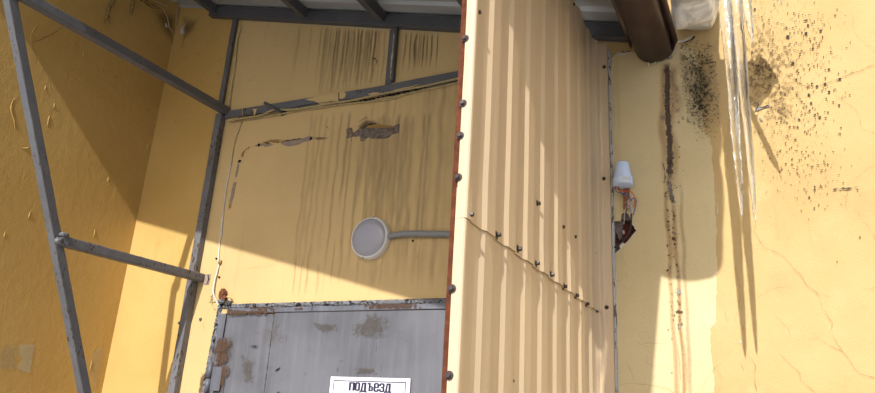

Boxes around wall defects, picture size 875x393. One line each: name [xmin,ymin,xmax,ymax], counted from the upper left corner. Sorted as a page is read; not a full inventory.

flaking render [346,117,400,141]
water stain [680,40,720,140]
water stain [742,1,853,220]
corrosion [661,63,684,339]
corrosion [226,307,274,316]
corrosion [212,337,231,392]